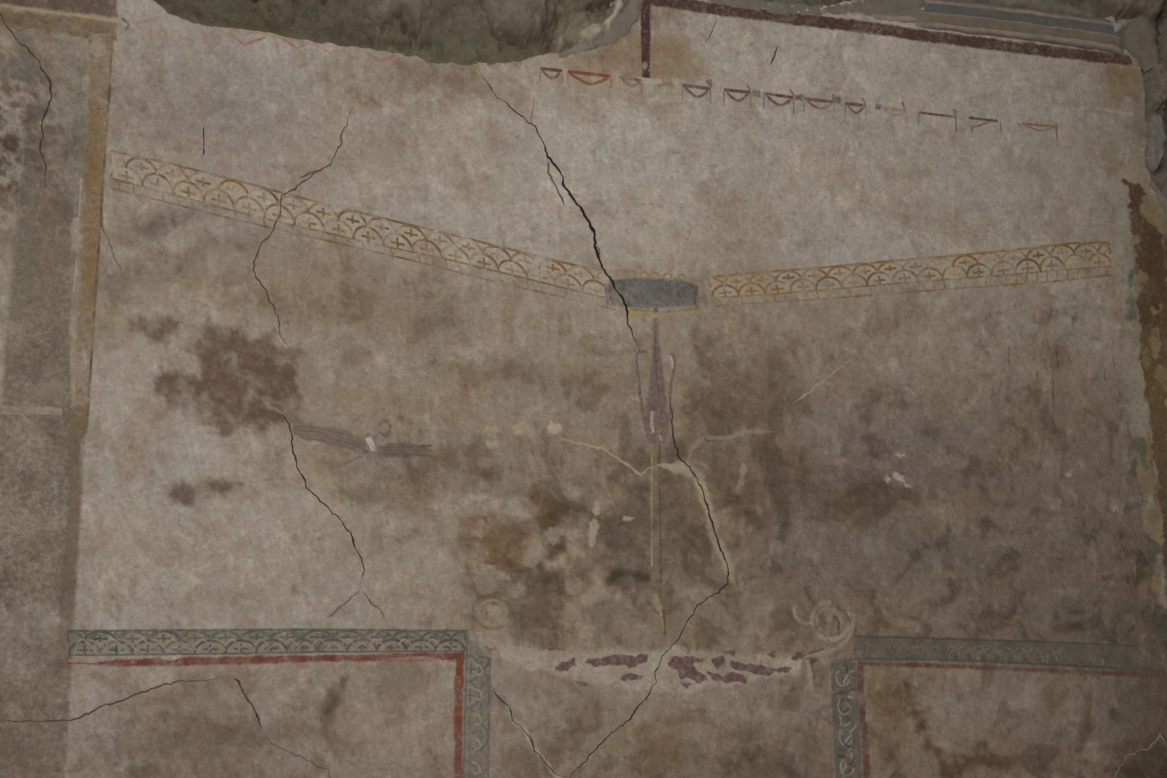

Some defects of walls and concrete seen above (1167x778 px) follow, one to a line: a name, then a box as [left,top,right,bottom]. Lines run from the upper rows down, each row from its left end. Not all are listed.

spalling [0,107,32,188]
water stain [106,304,317,511]
crack [252,99,356,408]
crack [246,388,386,620]
water stain [300,447,463,535]
spalling [154,0,645,65]
crack [478,66,642,355]
crack [489,383,776,778]
spalling [708,0,927,16]
spalling [956,0,1167,237]
peeling [1140,303,1167,409]
crack [1,675,330,778]